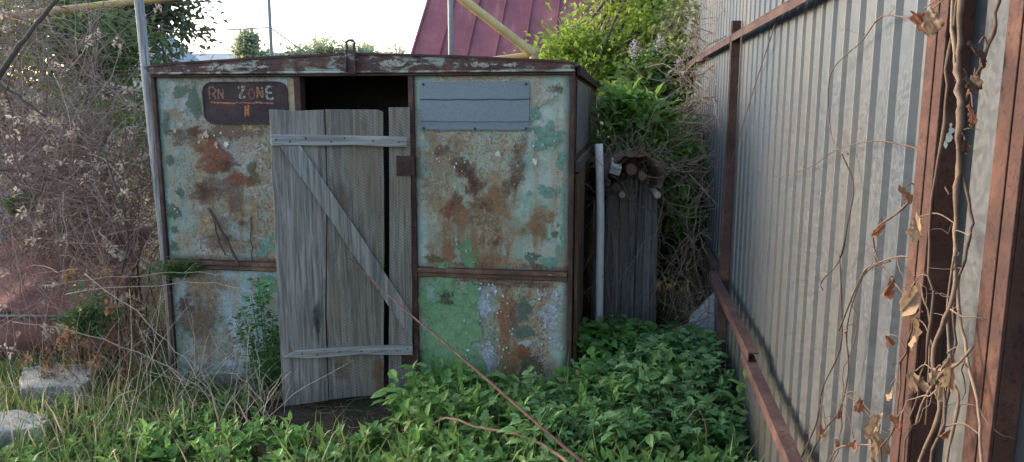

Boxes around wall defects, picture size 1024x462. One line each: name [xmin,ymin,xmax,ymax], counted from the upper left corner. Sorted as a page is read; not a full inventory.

peeling [378,59,421,67]
corrosion [166,106,270,253]
corrosion [416,130,554,380]
peeling [418,262,564,383]